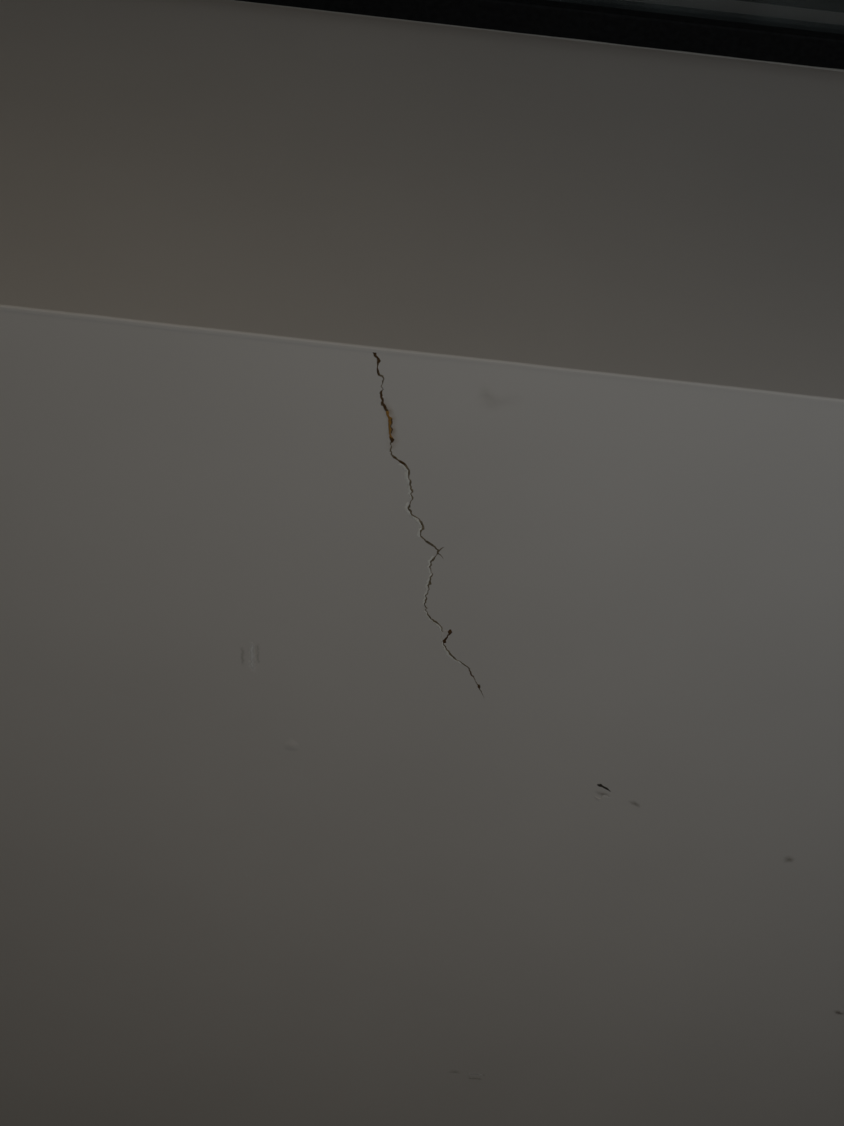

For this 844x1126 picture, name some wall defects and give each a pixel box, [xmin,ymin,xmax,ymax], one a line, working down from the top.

crack [373,352,483,695]